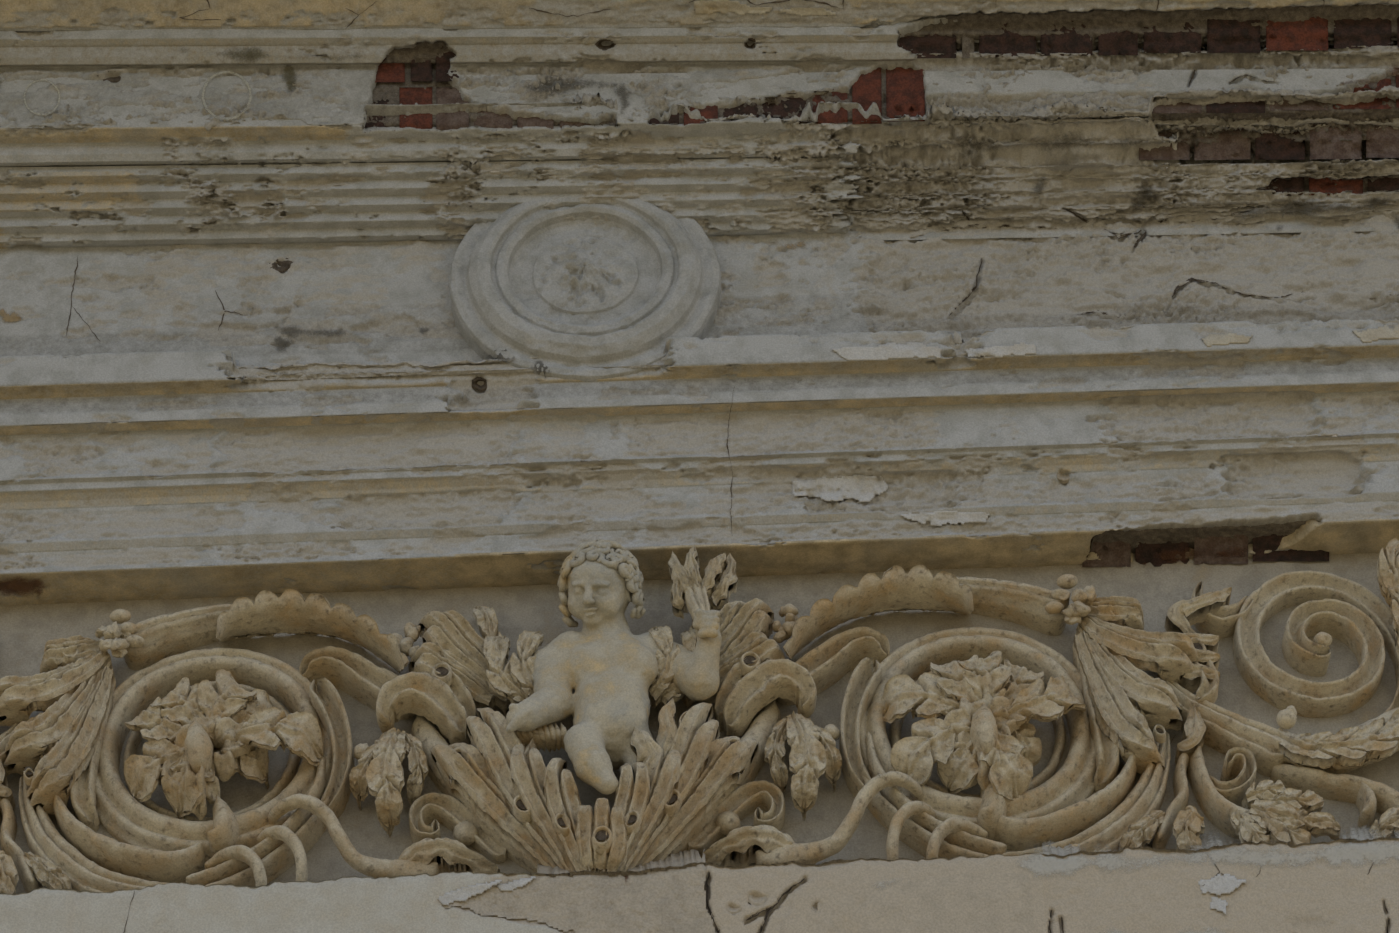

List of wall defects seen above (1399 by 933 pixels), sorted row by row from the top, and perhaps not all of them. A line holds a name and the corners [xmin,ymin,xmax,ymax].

flaking render [363,41,618,133]
spalling [595,39,616,50]
flaking render [648,4,1399,126]
flaking render [1139,74,1399,196]
peeling [792,474,888,502]
peeling [900,511,989,526]
flaking render [1082,521,1329,567]
crack [705,873,805,933]